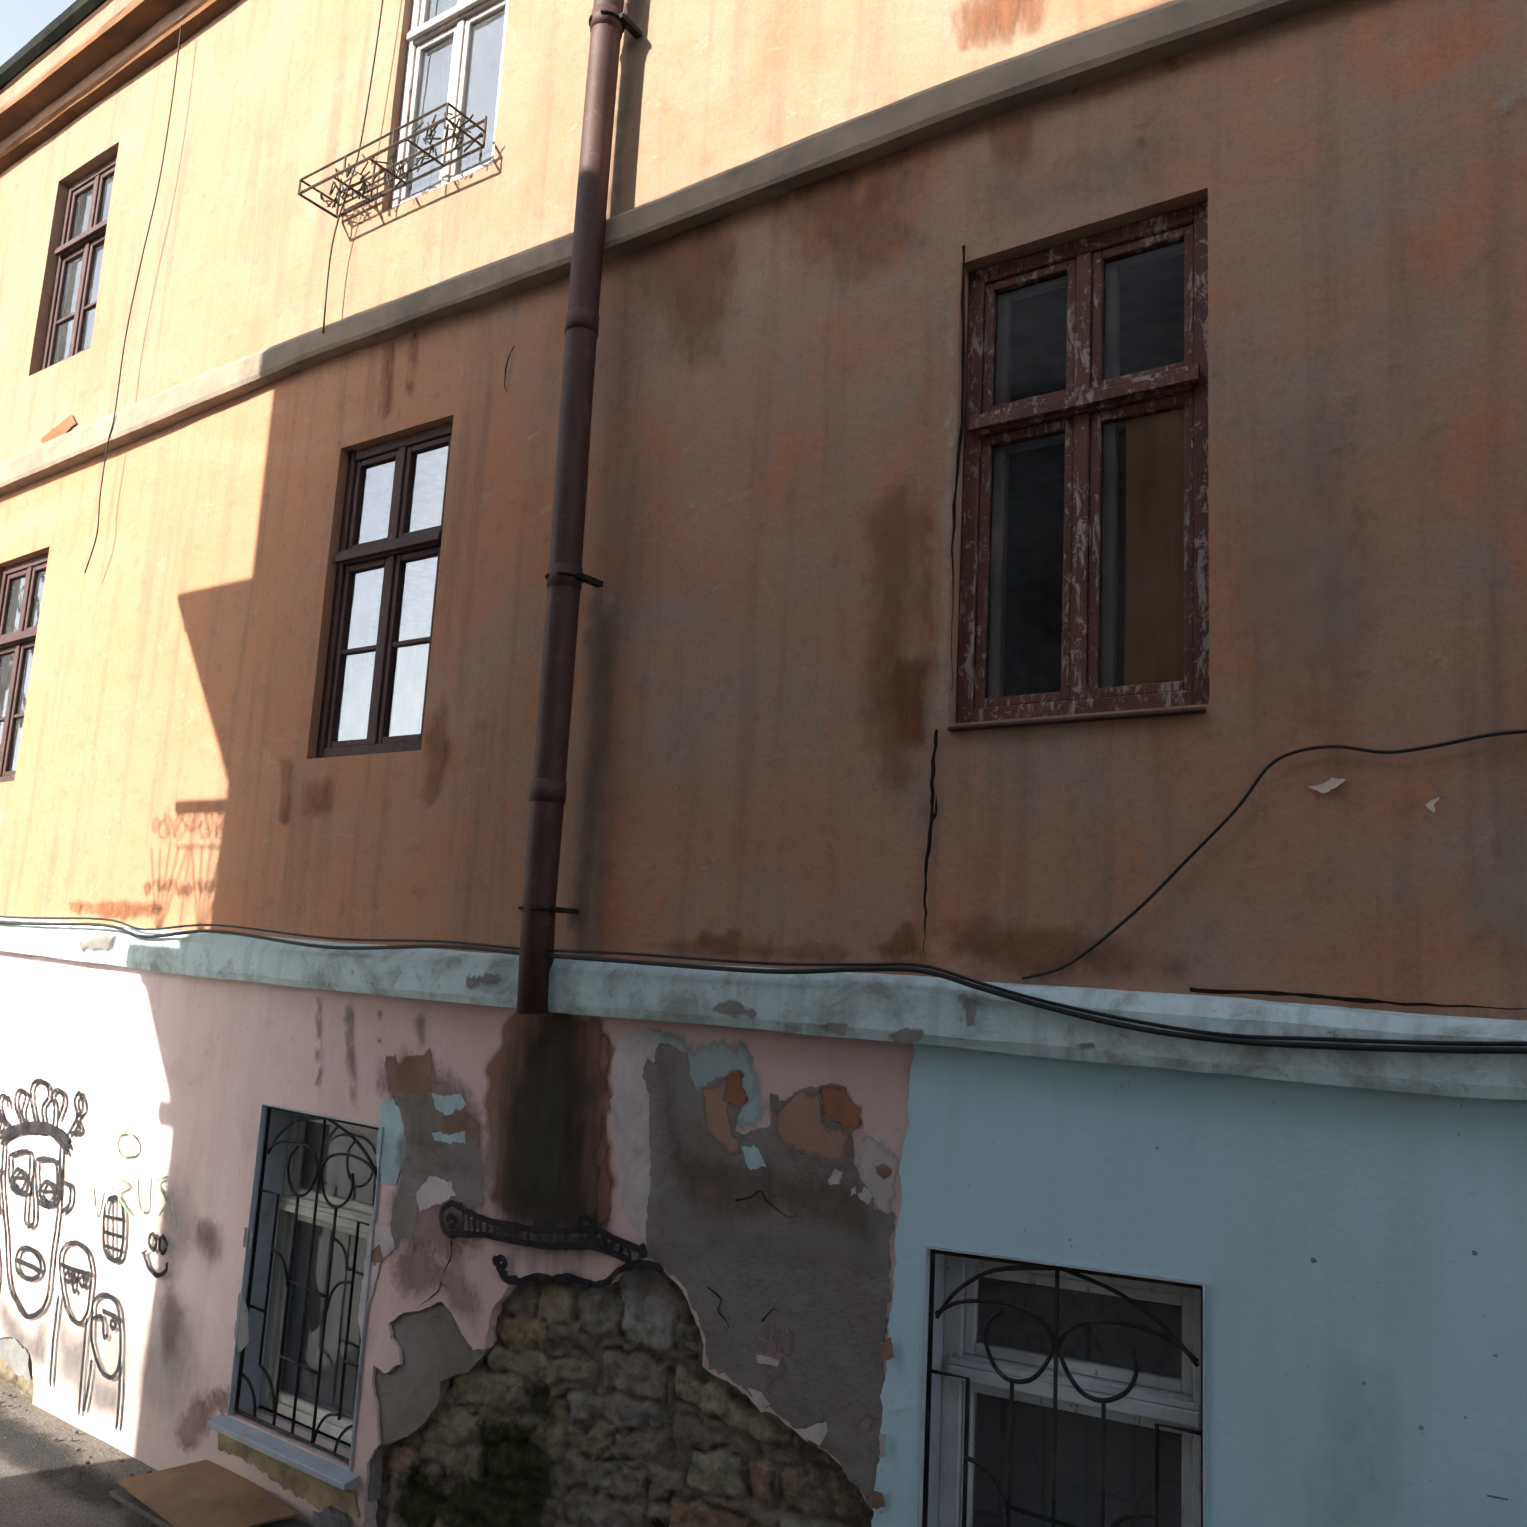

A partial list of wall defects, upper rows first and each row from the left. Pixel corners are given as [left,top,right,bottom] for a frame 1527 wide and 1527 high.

spalling [217,1026,896,1527]